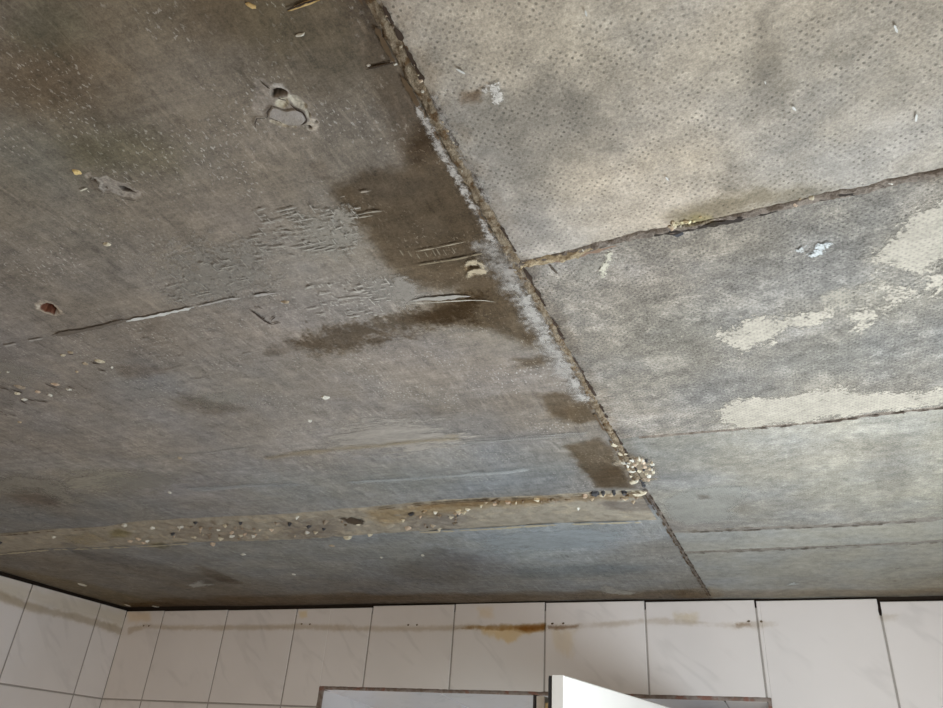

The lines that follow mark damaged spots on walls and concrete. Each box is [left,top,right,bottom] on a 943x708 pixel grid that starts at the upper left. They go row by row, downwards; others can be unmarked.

spalling [206,50,365,154]
water stain [416,95,589,401]